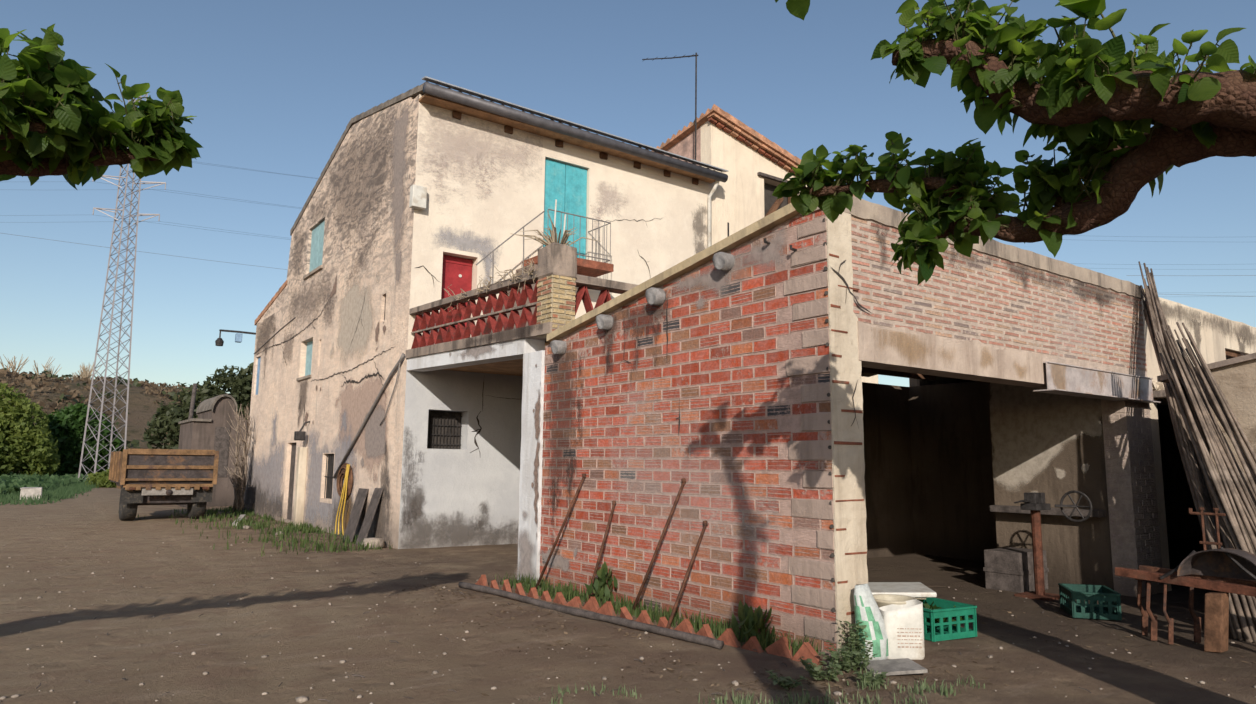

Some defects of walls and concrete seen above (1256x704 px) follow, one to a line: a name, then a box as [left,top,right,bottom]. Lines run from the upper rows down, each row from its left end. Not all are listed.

crack [260,295,394,424]
crack [470,375,515,453]
flaking render [989,383,1102,487]
water stain [405,489,518,549]